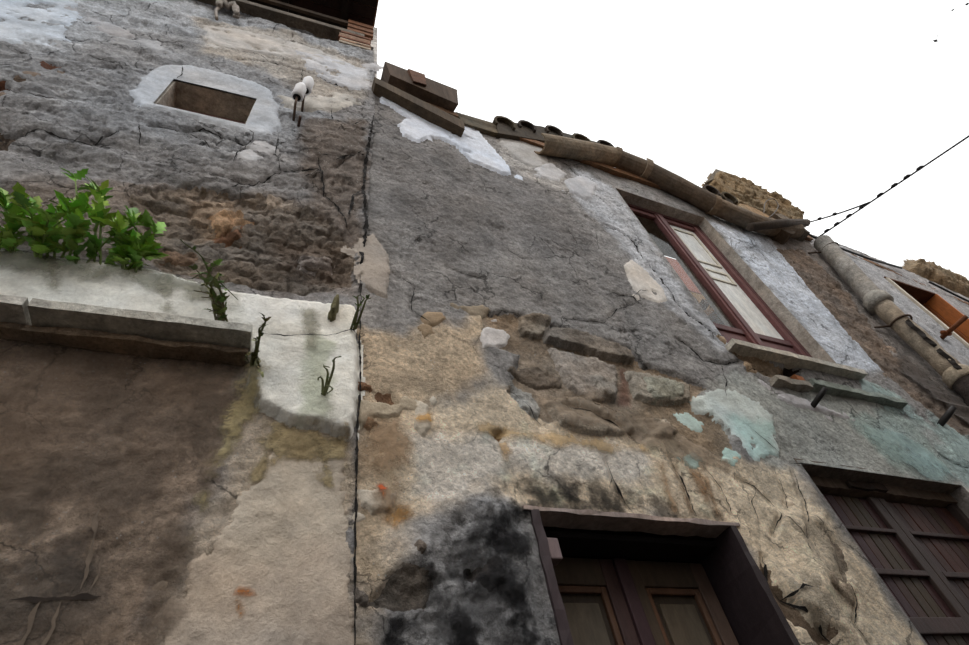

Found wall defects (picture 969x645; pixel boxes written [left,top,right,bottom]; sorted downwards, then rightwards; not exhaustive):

flaking render [0,0,173,54]
flaking render [202,25,597,200]
water stain [0,338,236,539]
crack [0,52,375,645]
spalling [128,186,390,322]
spalling [418,303,779,466]
crack [583,220,767,396]
crack [708,425,827,552]
water stain [0,536,105,645]
water stain [449,606,478,645]
water stain [475,510,551,645]
crack [762,557,833,645]